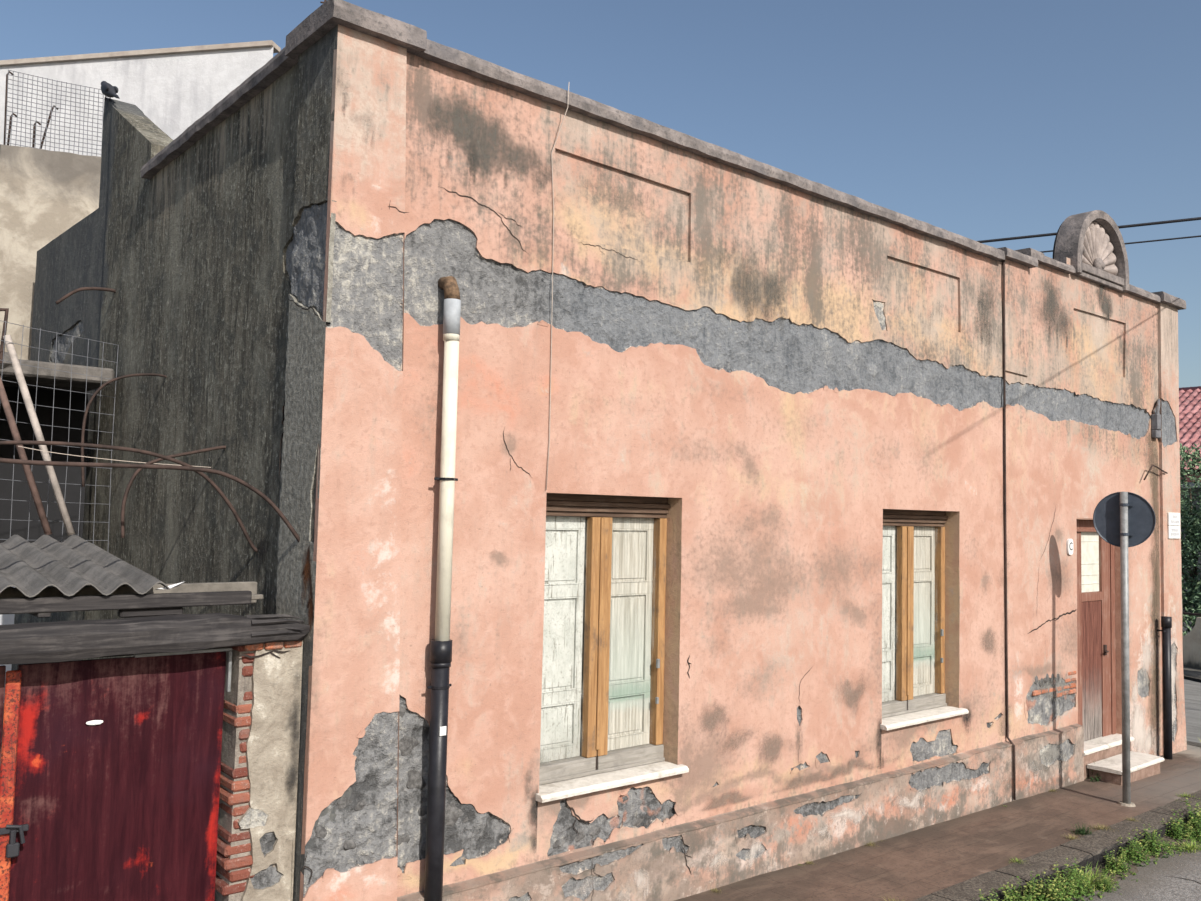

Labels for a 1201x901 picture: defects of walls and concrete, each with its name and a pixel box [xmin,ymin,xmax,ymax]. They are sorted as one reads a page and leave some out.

damp [433,104,539,181]
crack [442,187,524,251]
spalling [285,202,1177,447]
crack [1029,509,1076,633]
spalling [1024,671,1077,726]
spalling [239,808,283,889]
spalling [303,695,430,897]
spalling [444,776,514,866]
spalling [547,786,689,901]
spalling [734,825,766,861]
spalling [909,729,989,793]
spalling [1040,739,1075,767]